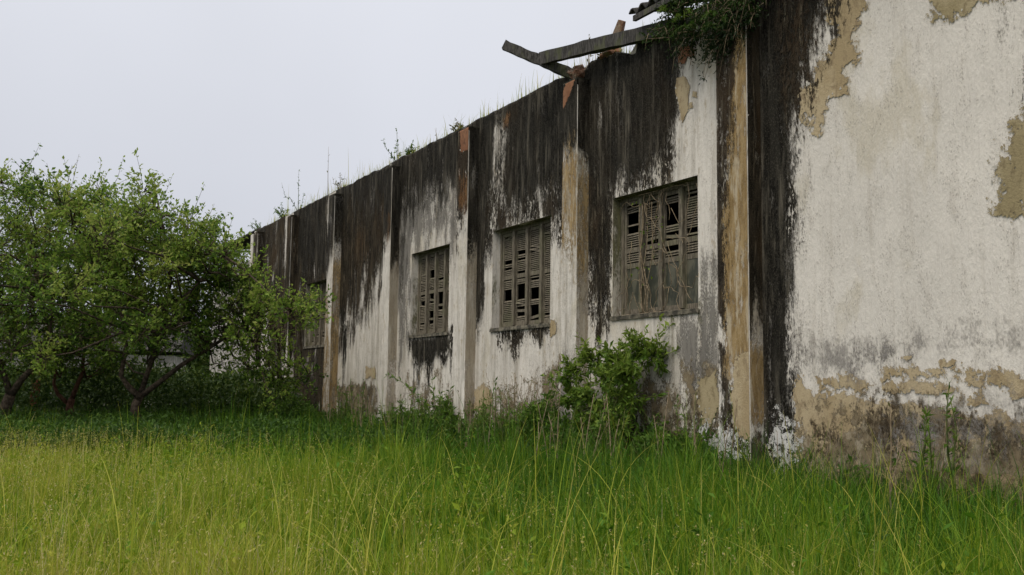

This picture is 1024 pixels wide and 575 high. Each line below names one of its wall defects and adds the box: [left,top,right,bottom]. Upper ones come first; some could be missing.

peeling [675,45,697,126]
peeling [797,0,869,138]
peeling [925,0,1012,25]
peeling [985,103,1024,225]
water stain [251,36,680,424]
water stain [587,0,1024,487]
peeling [765,355,1024,484]